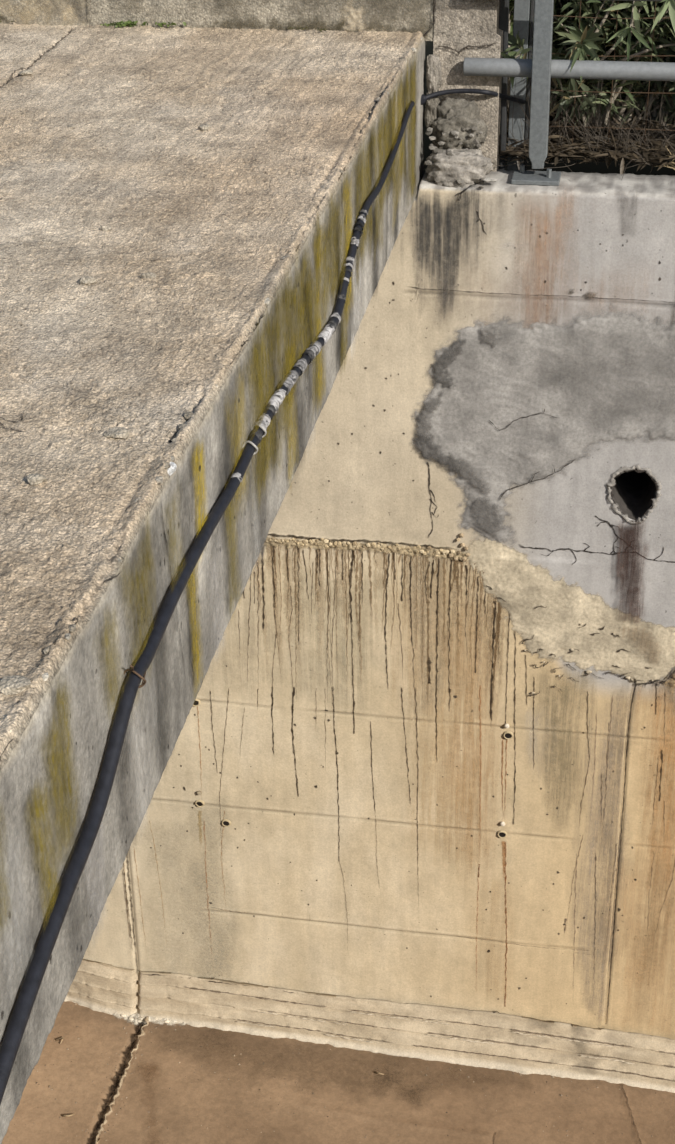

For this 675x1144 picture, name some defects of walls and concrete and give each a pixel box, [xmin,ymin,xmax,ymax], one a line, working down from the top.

water stain [228,64,478,512]
crack [489,409,556,431]
water stain [188,445,206,532]
crack [500,460,574,500]
crack [522,515,675,565]
water stain [188,566,200,683]
peeling [521,624,667,706]
water stain [210,690,229,802]
water stain [214,503,546,930]
water stain [653,750,665,826]
water stain [554,685,620,1012]